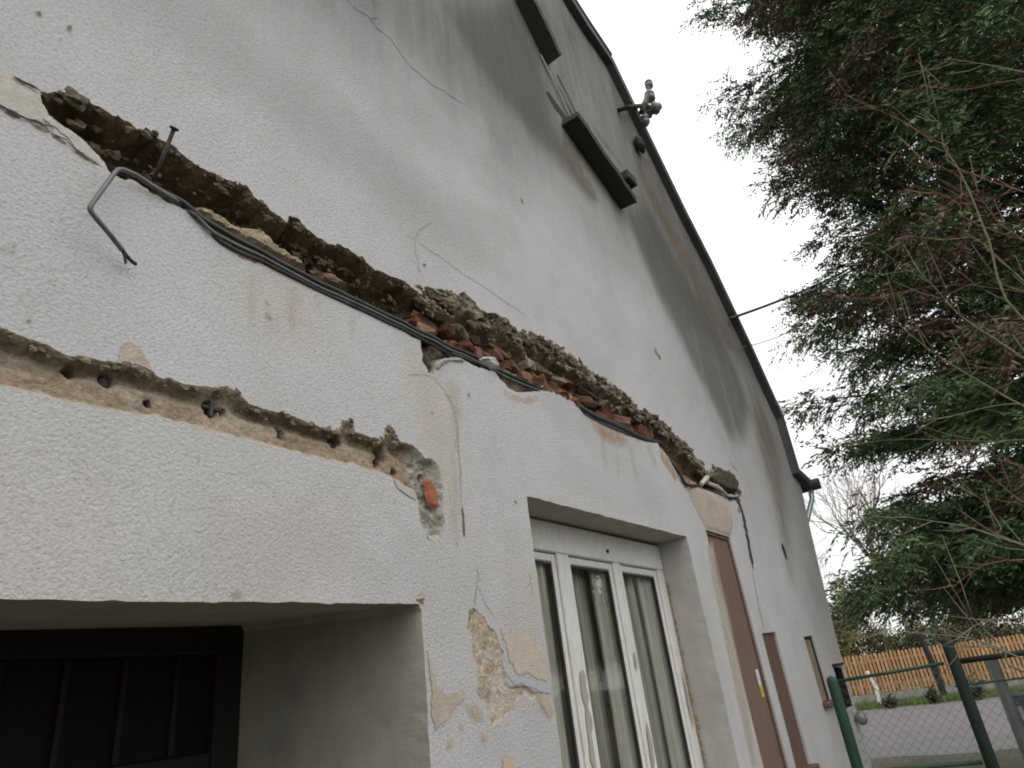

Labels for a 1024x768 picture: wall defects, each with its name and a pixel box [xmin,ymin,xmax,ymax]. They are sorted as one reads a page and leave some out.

spalling [0,67,741,512]
crack [730,464,765,629]
peeling [428,607,552,740]